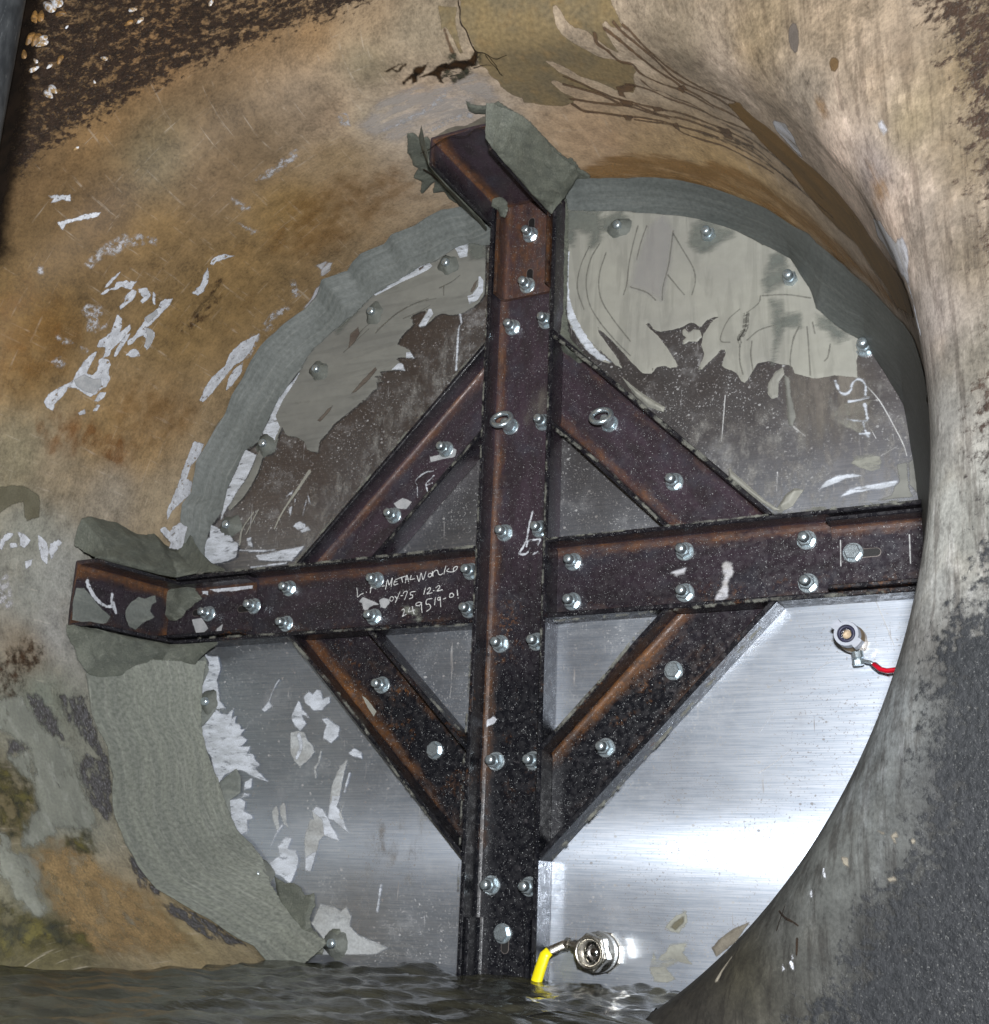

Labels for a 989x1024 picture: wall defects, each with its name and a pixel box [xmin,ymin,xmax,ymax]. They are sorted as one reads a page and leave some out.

crack [458,1,507,75]
water stain [0,0,40,256]
rust [585,157,892,304]
peeling [120,288,156,309]
peeling [44,334,140,415]
peeling [226,365,242,390]